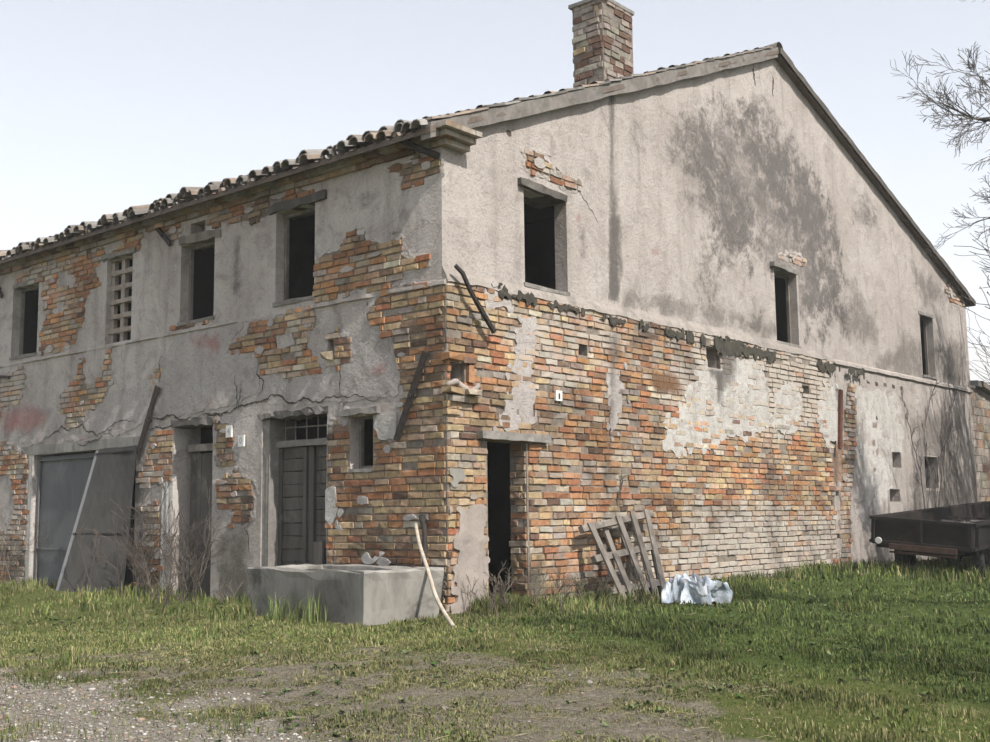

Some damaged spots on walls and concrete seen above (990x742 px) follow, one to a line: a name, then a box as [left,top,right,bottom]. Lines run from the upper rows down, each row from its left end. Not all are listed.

spalling [382,152,445,190]
spalling [520,147,583,194]
water stain [610,188,621,300]
water stain [670,109,844,321]
crack [32,357,390,446]
spalling [0,222,453,614]
peeling [481,281,537,431]
peeling [605,362,630,442]
peeling [661,354,905,564]